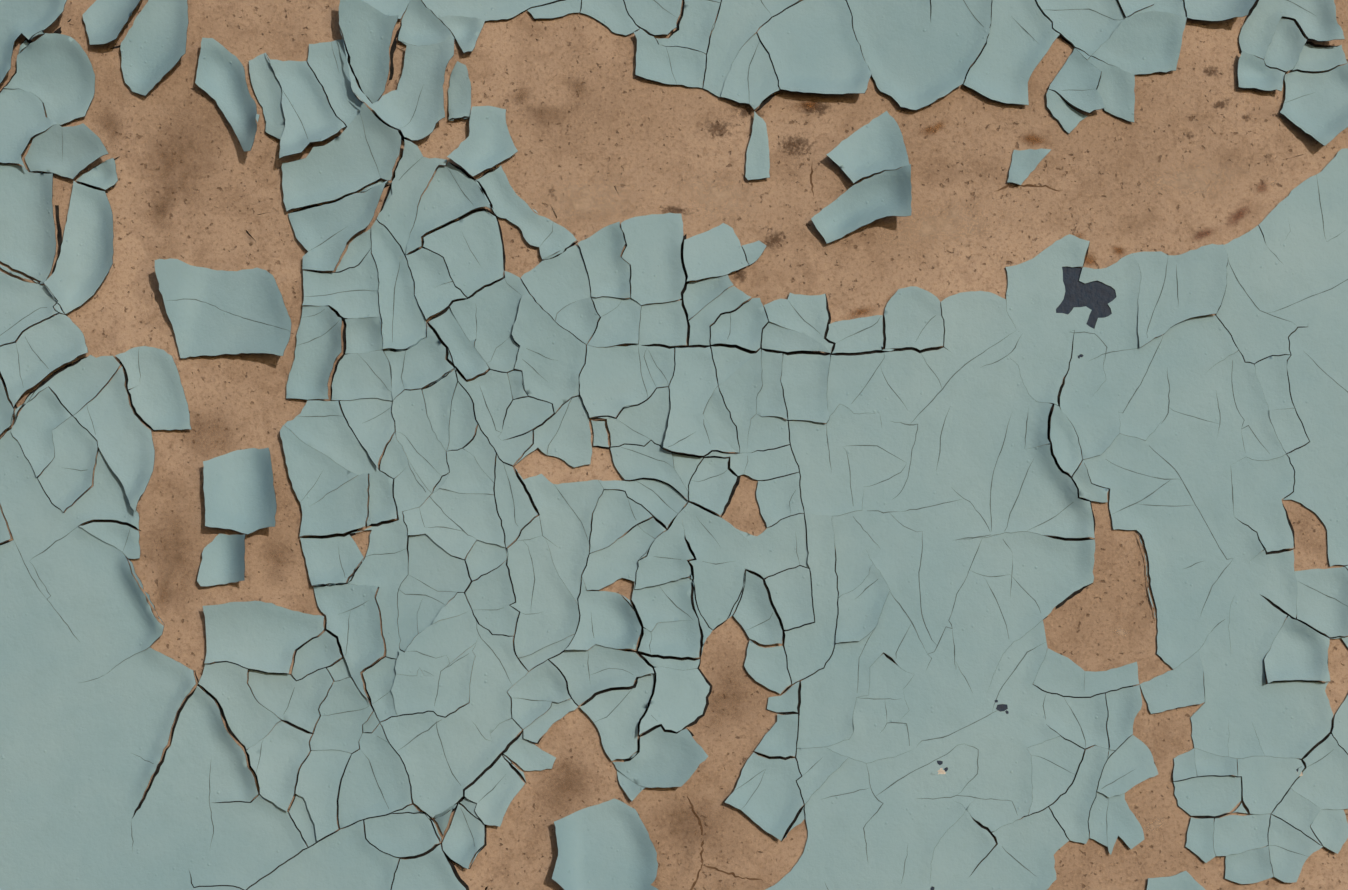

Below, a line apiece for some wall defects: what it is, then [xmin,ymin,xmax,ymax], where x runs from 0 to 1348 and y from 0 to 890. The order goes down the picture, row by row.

crack [389,1,457,80]
crack [623,0,803,112]
crack [0,136,141,642]
crack [120,350,154,431]
crack [131,671,263,853]
peeling [0,0,890,890]
crack [190,40,1233,890]
peeling [255,0,1348,671]
peeling [1027,404,1348,890]
crack [1123,260,1348,555]
crack [1173,718,1348,866]
crack [1261,581,1348,638]